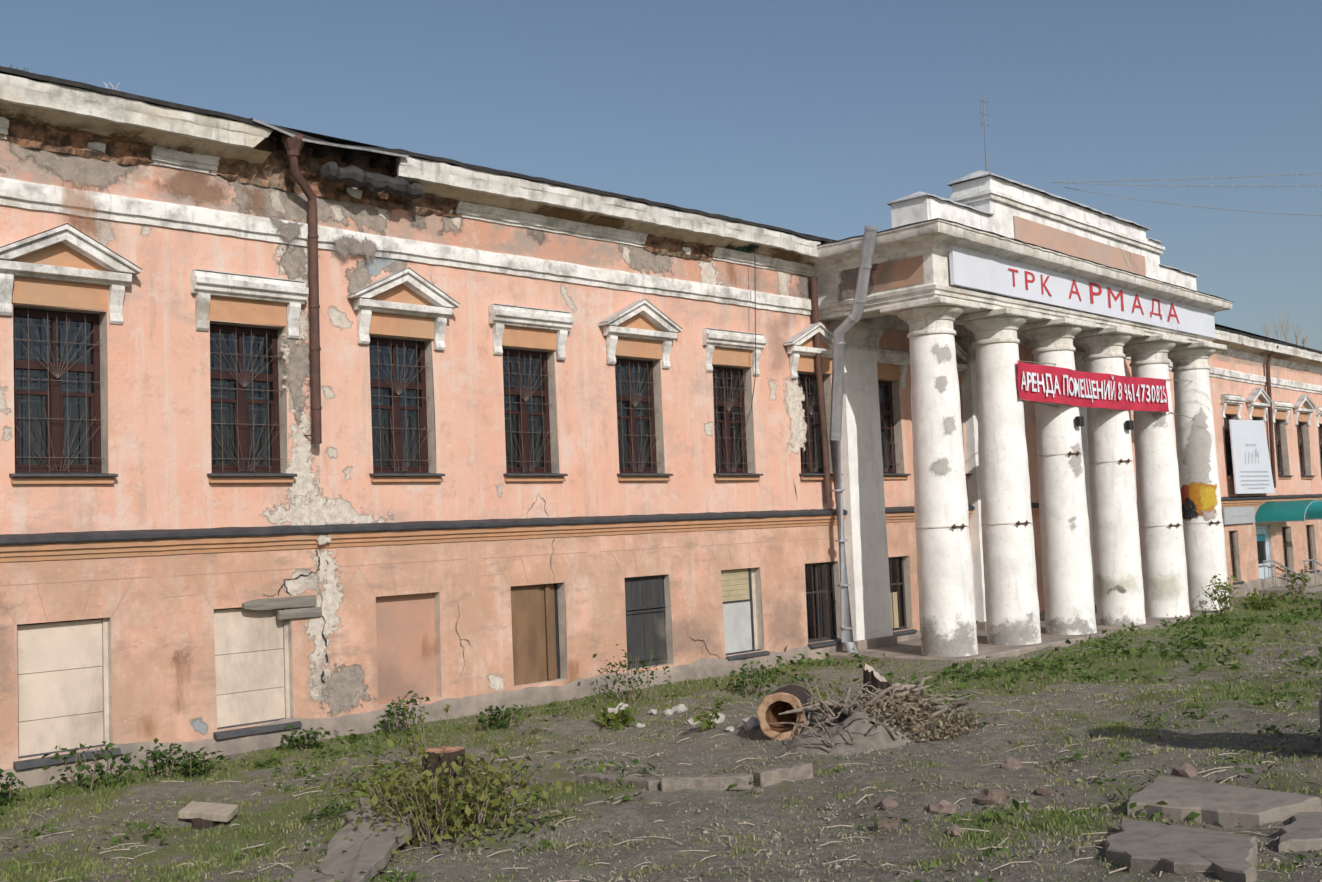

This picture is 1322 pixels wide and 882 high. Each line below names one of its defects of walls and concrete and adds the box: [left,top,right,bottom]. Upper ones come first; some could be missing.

flaking render [0,118,159,192]
flaking render [932,344,951,392]
flaking render [209,137,466,717]
flaking render [704,421,714,436]
flaking render [767,376,807,454]
flaking render [931,458,949,475]
flaking render [944,417,956,434]
flaking render [1183,407,1212,485]